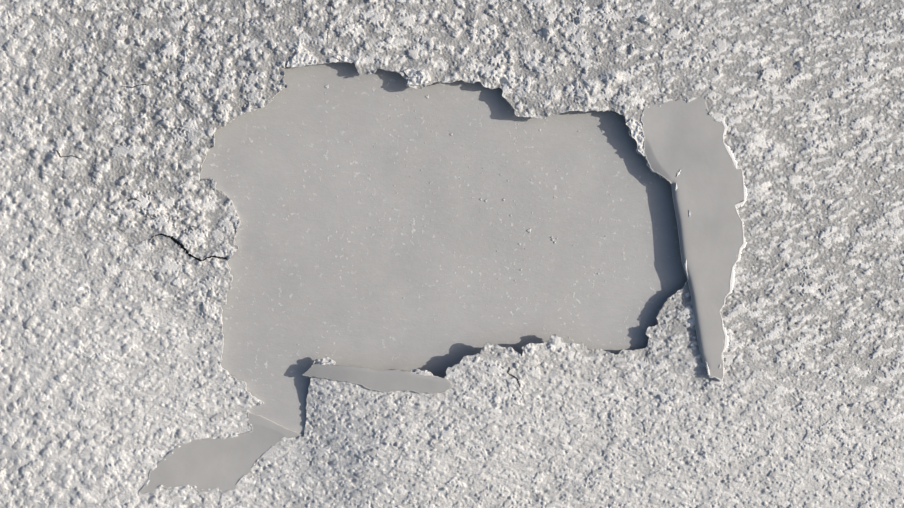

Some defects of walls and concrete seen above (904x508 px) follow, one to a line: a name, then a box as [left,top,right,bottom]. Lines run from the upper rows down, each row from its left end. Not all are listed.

crack [149,226,228,262]
peeling [139,50,748,494]